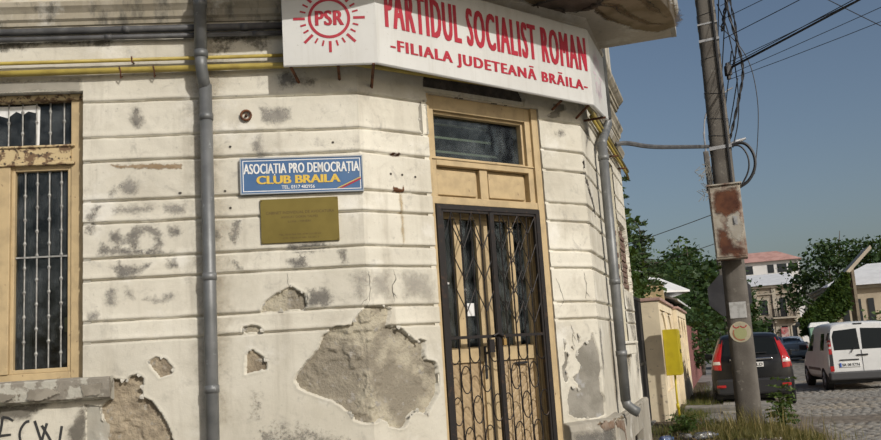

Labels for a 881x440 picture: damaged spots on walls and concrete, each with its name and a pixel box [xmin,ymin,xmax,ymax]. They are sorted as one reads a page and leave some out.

spalling [532,0,604,14]
crack [581,161,596,217]
spalling [261,285,330,313]
spalling [147,356,175,377]
spalling [247,349,269,373]
spalling [296,305,436,428]
peeling [27,388,61,401]
spalling [80,374,173,440]
peeling [562,332,627,440]